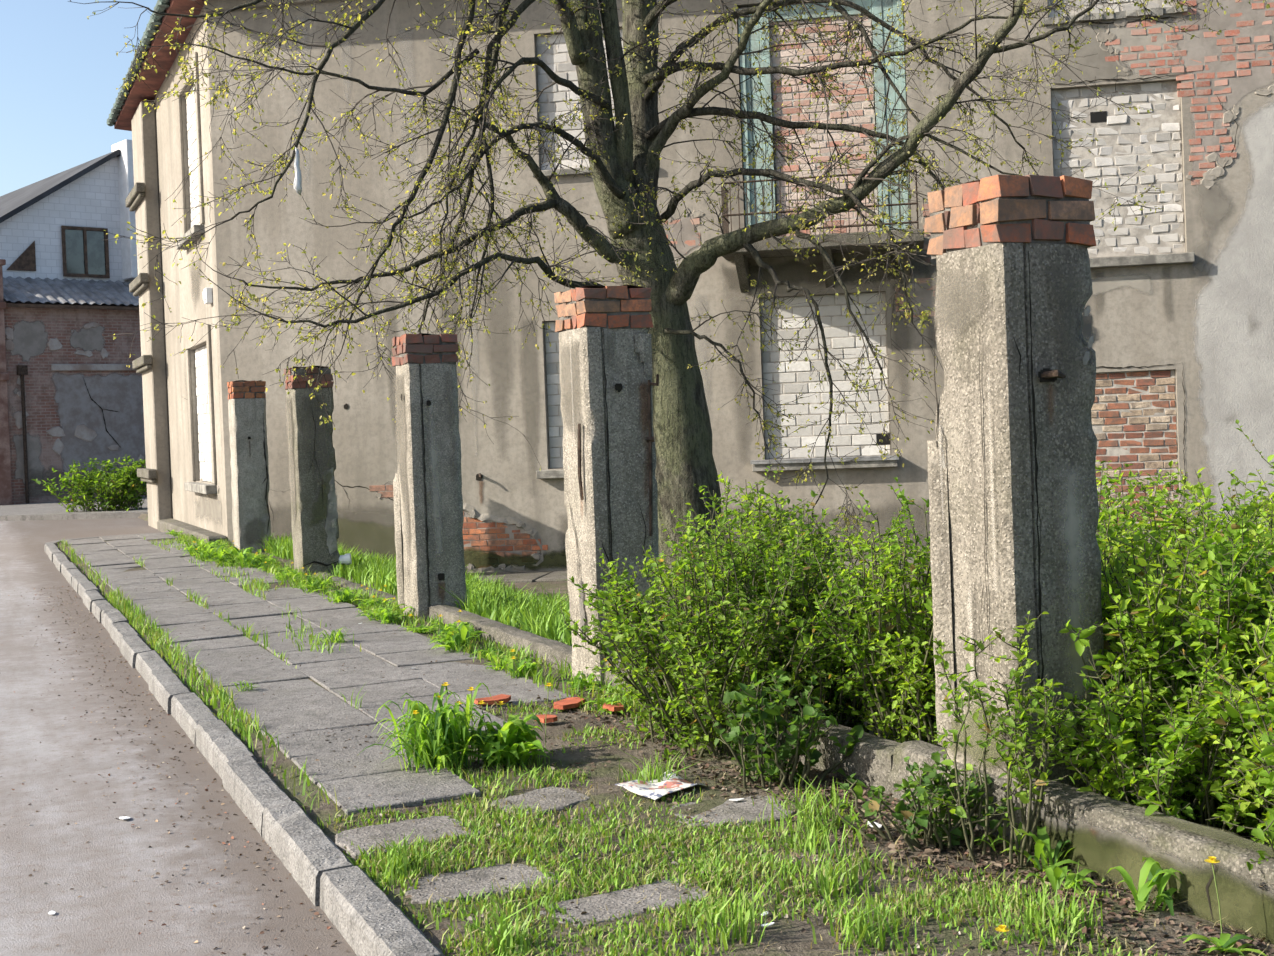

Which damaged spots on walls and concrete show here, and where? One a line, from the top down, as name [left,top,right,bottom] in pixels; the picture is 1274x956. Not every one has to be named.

peeling [1096,0,1274,189]
peeling [5,320,109,362]
peeling [12,373,146,485]
crack [84,381,119,445]
spalling [462,503,548,573]
crack [979,360,992,686]
crack [1013,251,1045,709]